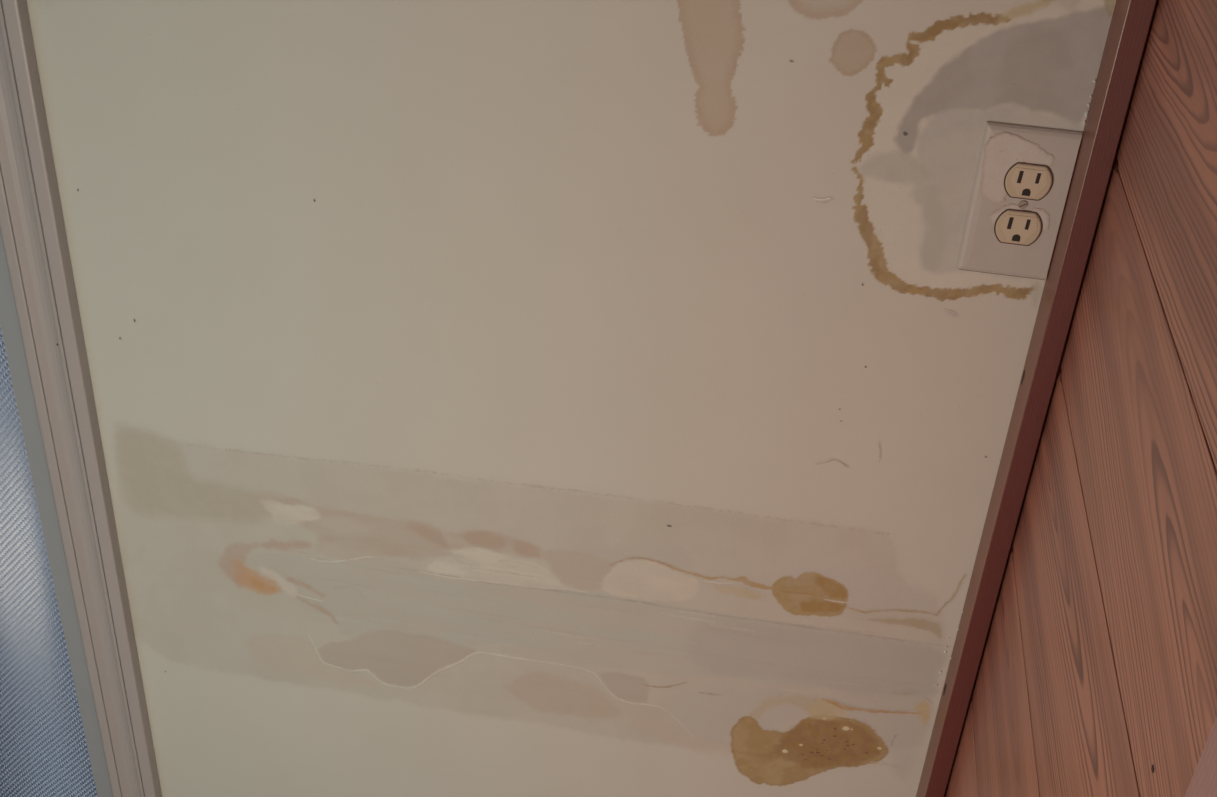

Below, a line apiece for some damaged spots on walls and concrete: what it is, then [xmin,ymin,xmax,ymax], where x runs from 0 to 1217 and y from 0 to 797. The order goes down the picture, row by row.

damp [675,0,747,139]
damp [786,0,1086,312]
peeling [106,417,959,785]
damp [770,570,851,618]
damp [728,691,905,788]